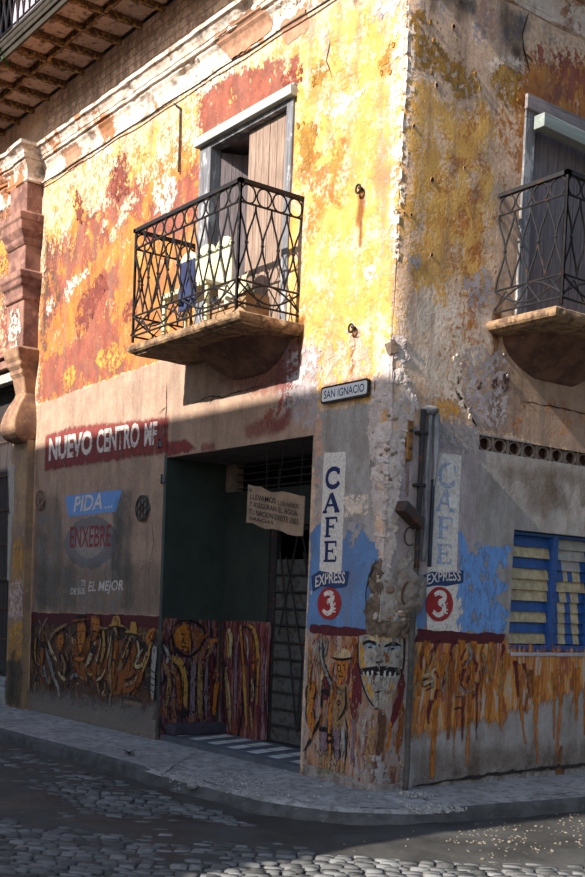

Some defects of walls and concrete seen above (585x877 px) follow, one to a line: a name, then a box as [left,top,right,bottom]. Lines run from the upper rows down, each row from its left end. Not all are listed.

crack [522,13,534,72]
spalling [48,0,309,244]
peeling [47,268,110,337]
peeling [63,362,76,391]
peeling [93,341,128,372]
crack [194,381,272,403]
crack [522,401,585,417]
spalling [284,330,512,638]